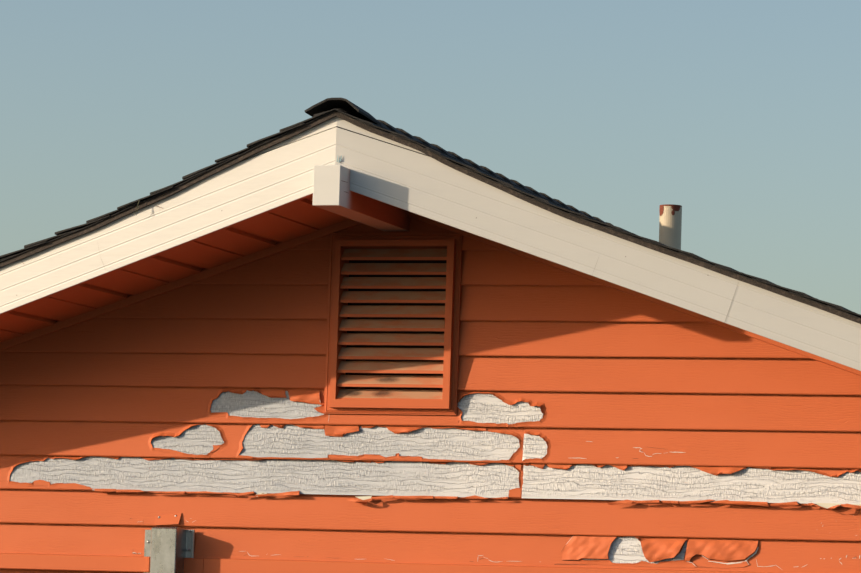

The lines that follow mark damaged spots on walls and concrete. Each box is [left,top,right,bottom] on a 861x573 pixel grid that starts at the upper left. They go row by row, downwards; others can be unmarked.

peeling [7,388,861,516]
peeling [562,536,759,568]